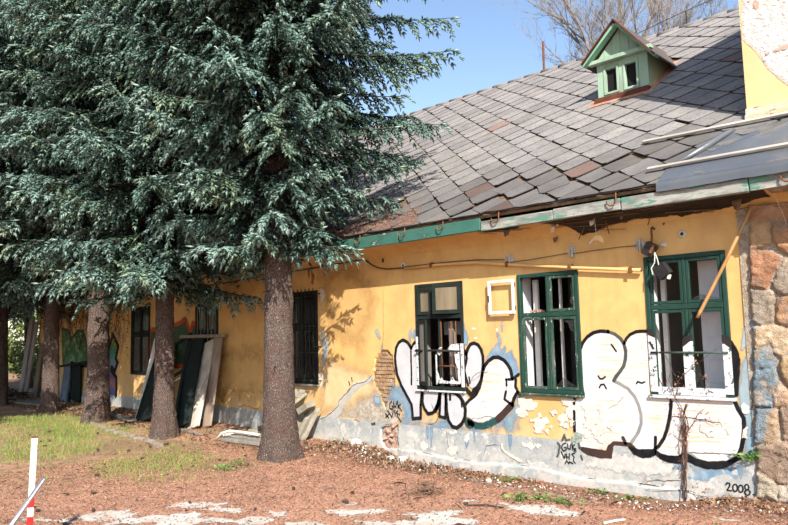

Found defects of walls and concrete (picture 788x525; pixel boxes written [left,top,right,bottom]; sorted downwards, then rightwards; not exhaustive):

flaking render [741,0,788,85]
flaking render [326,350,400,426]
peeling [515,396,578,450]